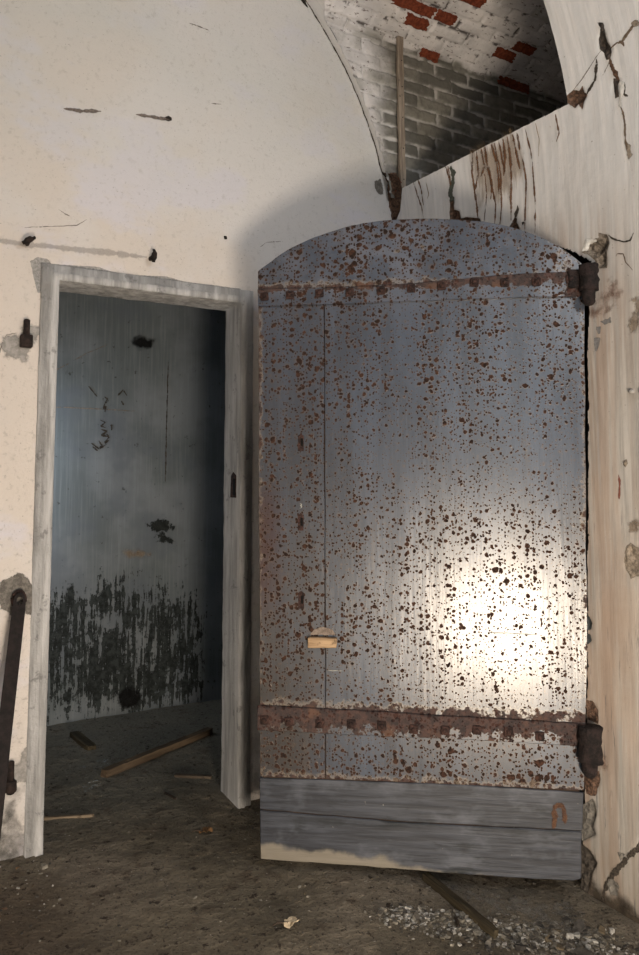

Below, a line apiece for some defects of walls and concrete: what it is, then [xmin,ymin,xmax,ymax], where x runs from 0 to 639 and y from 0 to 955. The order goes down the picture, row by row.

crack [573,20,639,159]
rust [471,123,539,229]
flaking render [582,233,609,268]
flaking render [624,521,639,578]
water stain [46,567,216,726]
water stain [0,811,17,861]
crack [602,843,639,901]